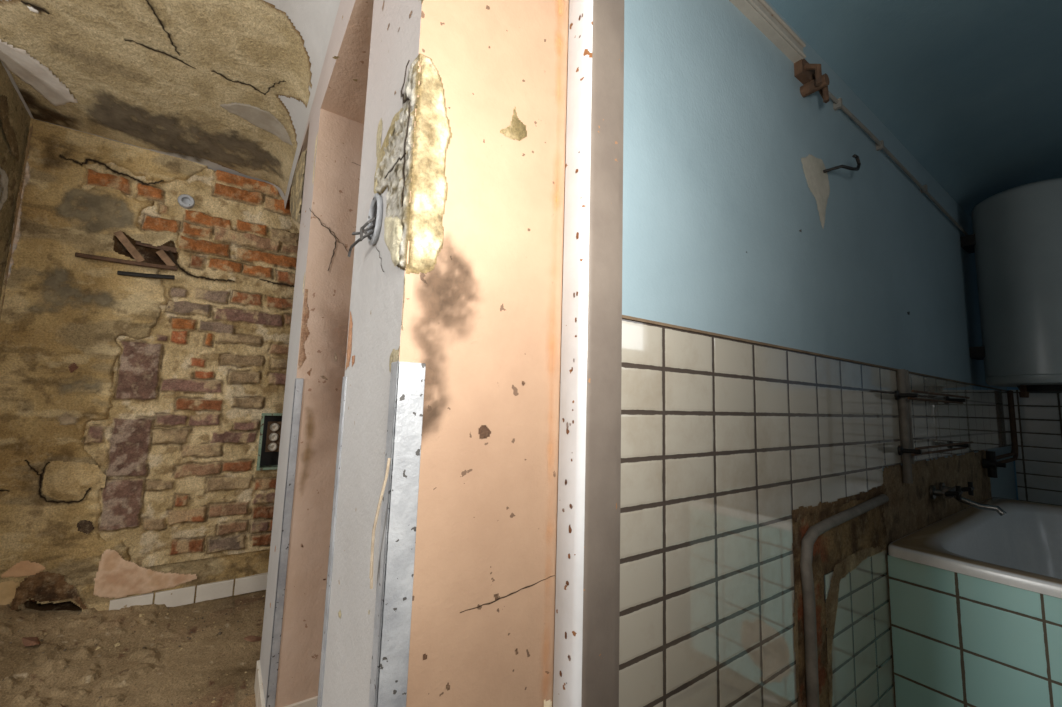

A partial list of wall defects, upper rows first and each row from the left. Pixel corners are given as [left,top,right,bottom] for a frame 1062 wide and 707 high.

crack [125,0,286,95]
crack [59,154,164,185]
leakage [87,94,280,176]
flaking render [374,53,452,331]
flaking render [0,0,328,567]
flaking render [389,346,400,373]